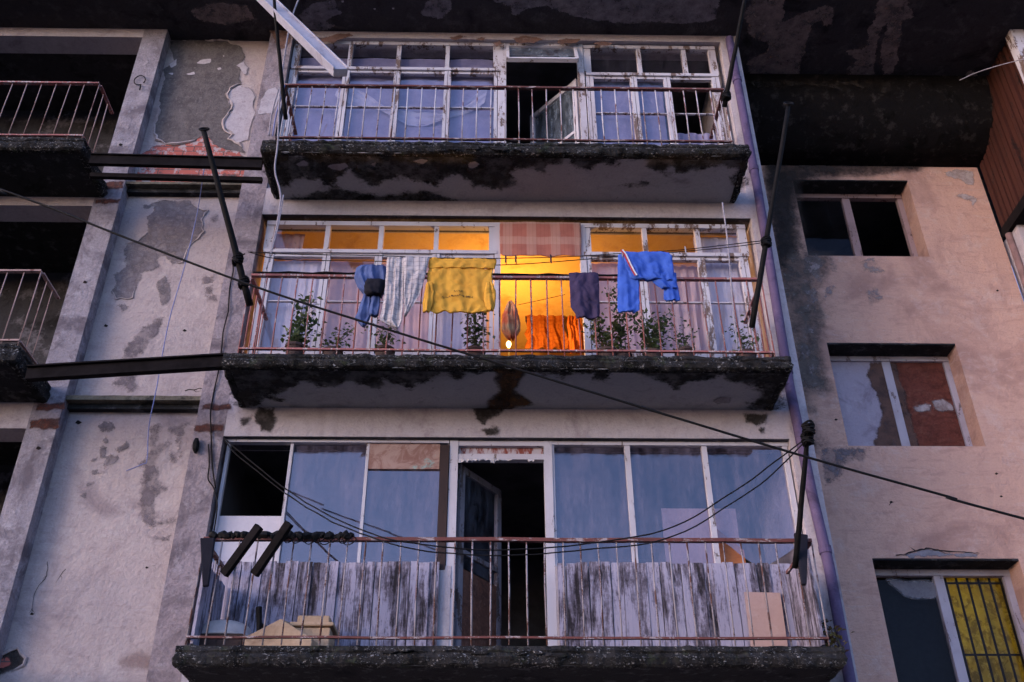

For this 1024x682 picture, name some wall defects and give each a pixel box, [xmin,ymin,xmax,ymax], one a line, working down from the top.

peeling [744,0,914,93]
flaking render [142,39,279,157]
flaking render [136,167,244,182]
leakage [263,150,749,201]
peeling [111,199,216,310]
leakage [526,206,829,433]
leakage [226,363,504,435]
leakage [140,426,172,525]
flaking render [906,549,978,558]